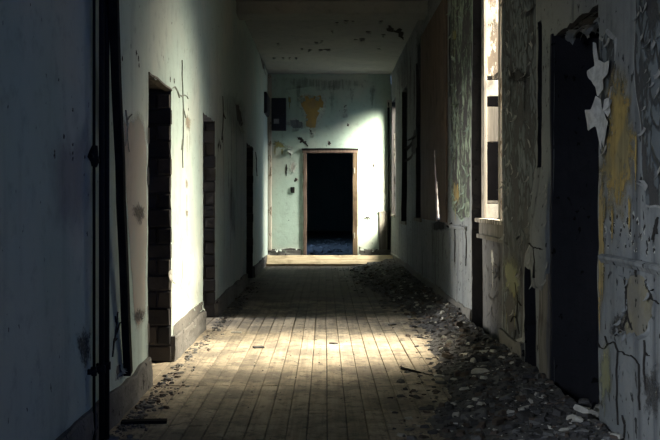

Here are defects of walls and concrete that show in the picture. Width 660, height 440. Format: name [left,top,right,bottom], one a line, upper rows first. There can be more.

crack [172,60,188,168]
peeling [286,92,327,138]
peeling [482,0,537,342]
peeling [564,12,617,161]
damp [600,68,637,239]
peeling [633,0,660,208]
crack [510,285,522,339]
crack [598,270,659,438]
spalling [613,270,656,341]